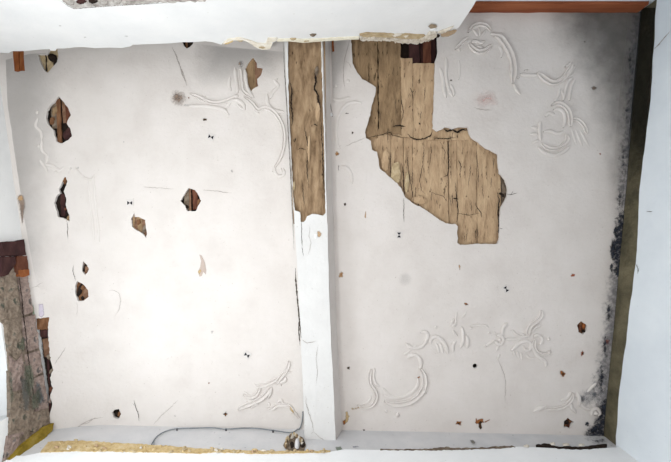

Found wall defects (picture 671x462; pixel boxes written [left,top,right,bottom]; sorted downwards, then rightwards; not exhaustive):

spalling [39,49,58,72]
spalling [48,98,72,143]
spalling [222,24,507,245]
spalling [56,177,70,220]
spalling [182,188,201,211]
spalling [132,214,147,236]
water stain [585,80,634,442]
spalling [77,282,89,301]
crack [295,268,318,384]
spalling [0,267,53,462]